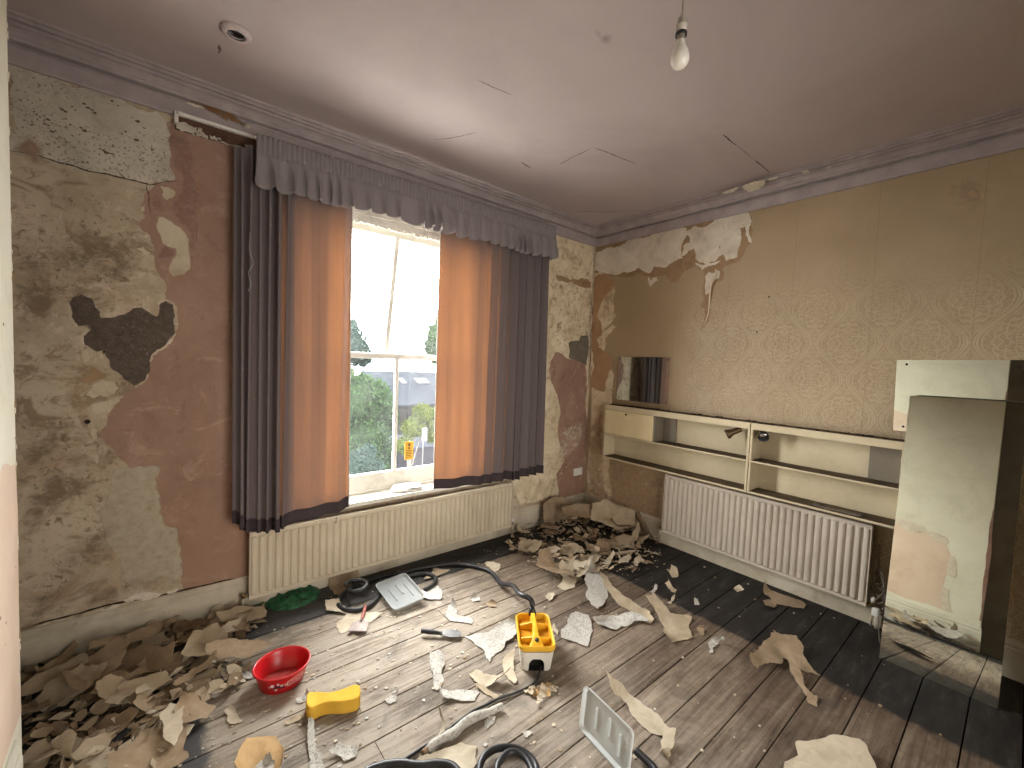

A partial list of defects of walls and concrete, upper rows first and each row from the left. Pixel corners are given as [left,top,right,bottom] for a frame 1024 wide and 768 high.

crack [10,150,176,214]
flaking render [8,64,249,591]
flaking render [512,212,753,505]